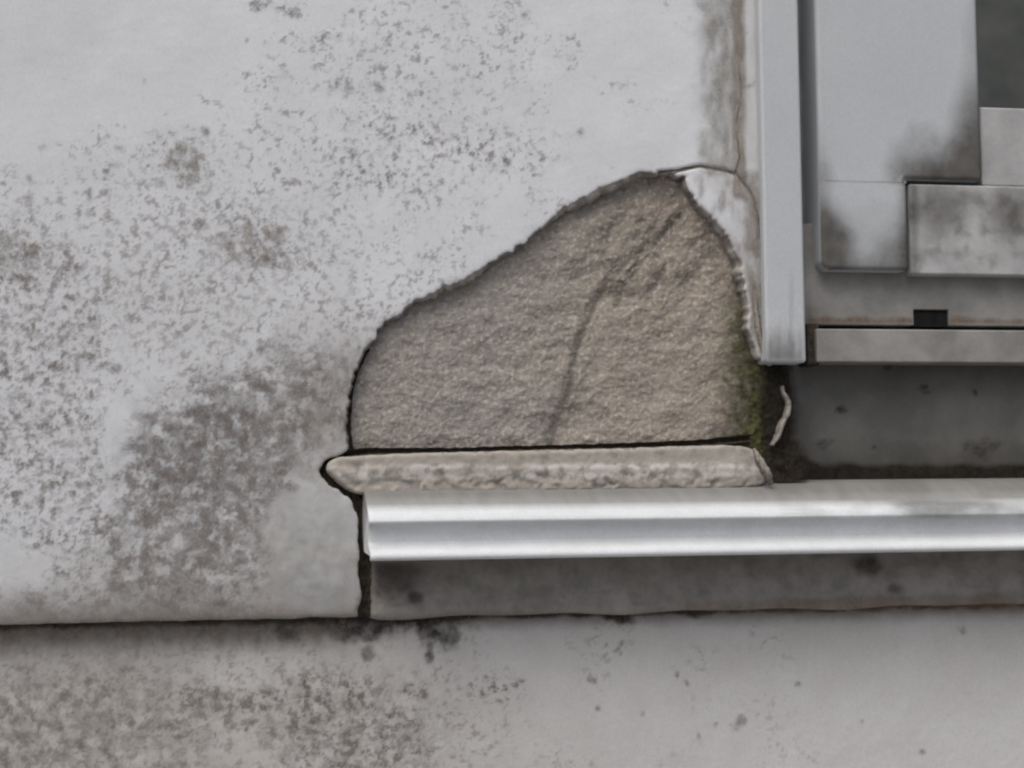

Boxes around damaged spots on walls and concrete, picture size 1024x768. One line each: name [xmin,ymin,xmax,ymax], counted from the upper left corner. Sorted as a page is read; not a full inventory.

damp [708,0,760,257]
spalling [345,171,792,485]
damp [749,275,762,349]
crack [319,348,752,617]